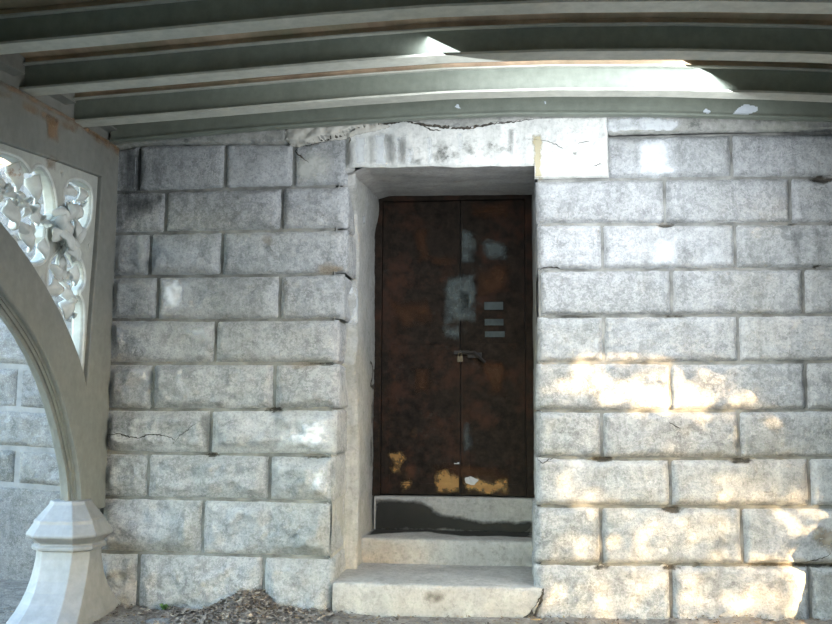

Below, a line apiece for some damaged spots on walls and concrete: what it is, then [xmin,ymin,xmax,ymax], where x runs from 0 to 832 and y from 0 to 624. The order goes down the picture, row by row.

spalling [285,123,389,148]
crack [288,119,589,163]
crack [109,424,195,443]
spalling [813,527,832,549]
crack [523,588,544,618]